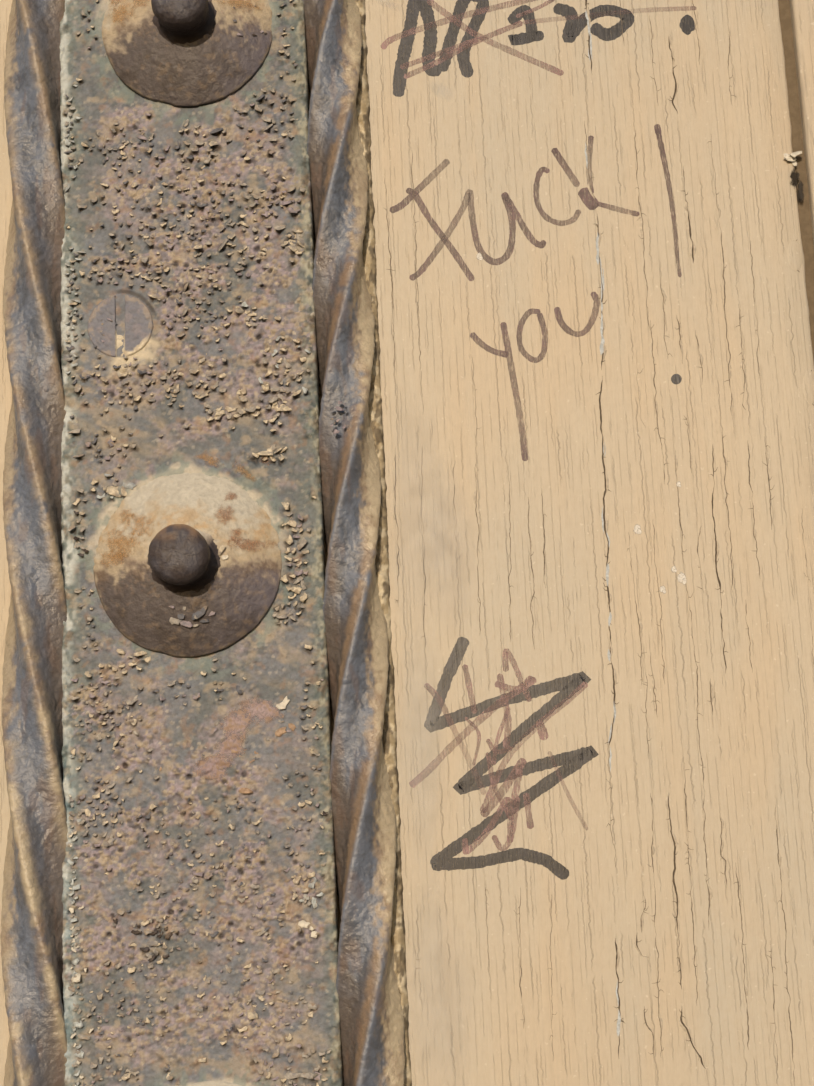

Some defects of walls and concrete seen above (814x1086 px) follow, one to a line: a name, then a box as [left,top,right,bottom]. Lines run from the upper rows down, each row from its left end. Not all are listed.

crack [583,0,592,72]
crack [649,0,700,113]
crack [728,32,736,104]
crack [384,153,424,411]
corrosion [220,494,258,550]
crack [393,447,427,668]
crack [453,464,481,631]
crack [508,471,546,649]
crack [584,121,795,1085]
crack [483,889,491,968]
crack [515,888,524,1028]